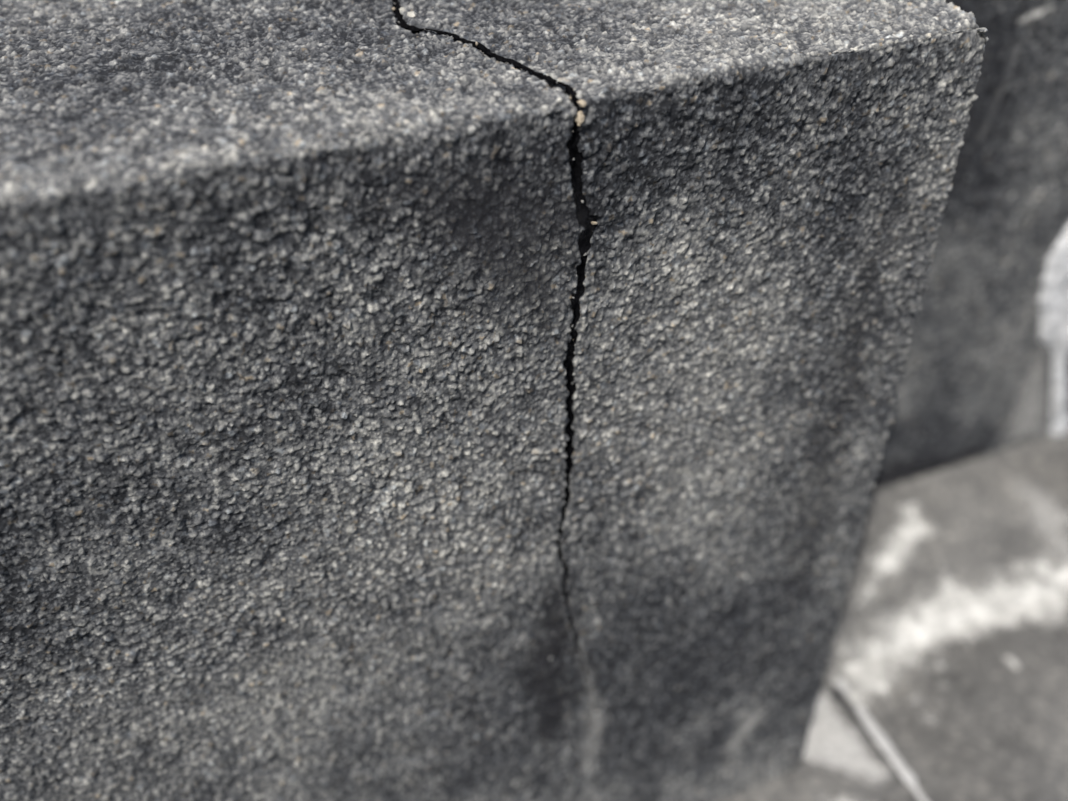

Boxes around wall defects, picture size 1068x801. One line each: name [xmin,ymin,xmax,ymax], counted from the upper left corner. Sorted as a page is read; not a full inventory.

crack [392,0,598,725]
leakage [831,493,1068,755]